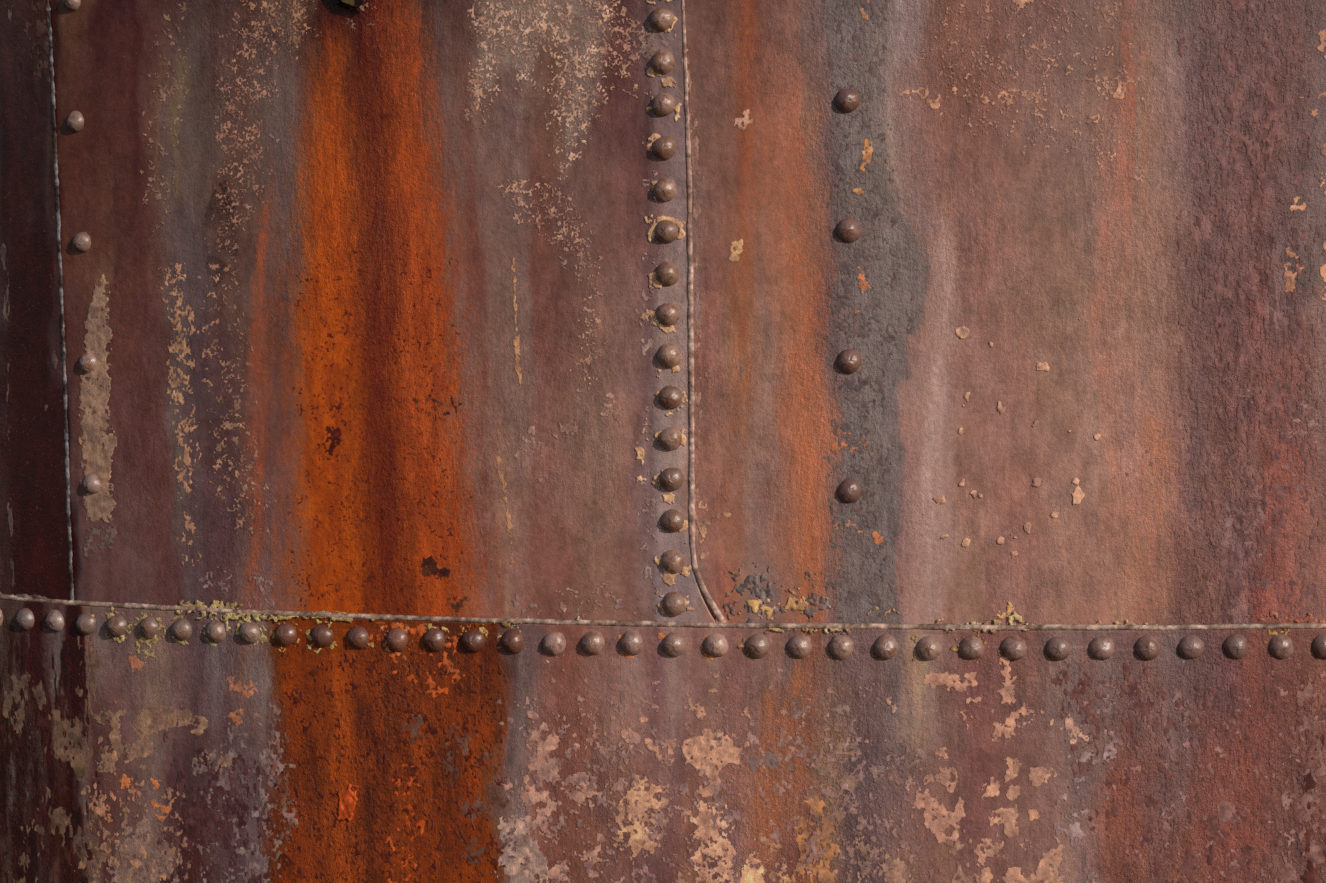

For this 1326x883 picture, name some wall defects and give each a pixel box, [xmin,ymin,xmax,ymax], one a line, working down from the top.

peeling [1317,28,1326,59]
peeling [78,273,118,557]
peeling [158,0,473,616]
rust [238,0,513,883]
peeling [461,0,732,620]
rust [700,0,849,883]
rust [1118,367,1192,610]
peeling [1289,196,1306,212]
peeling [1284,240,1326,301]